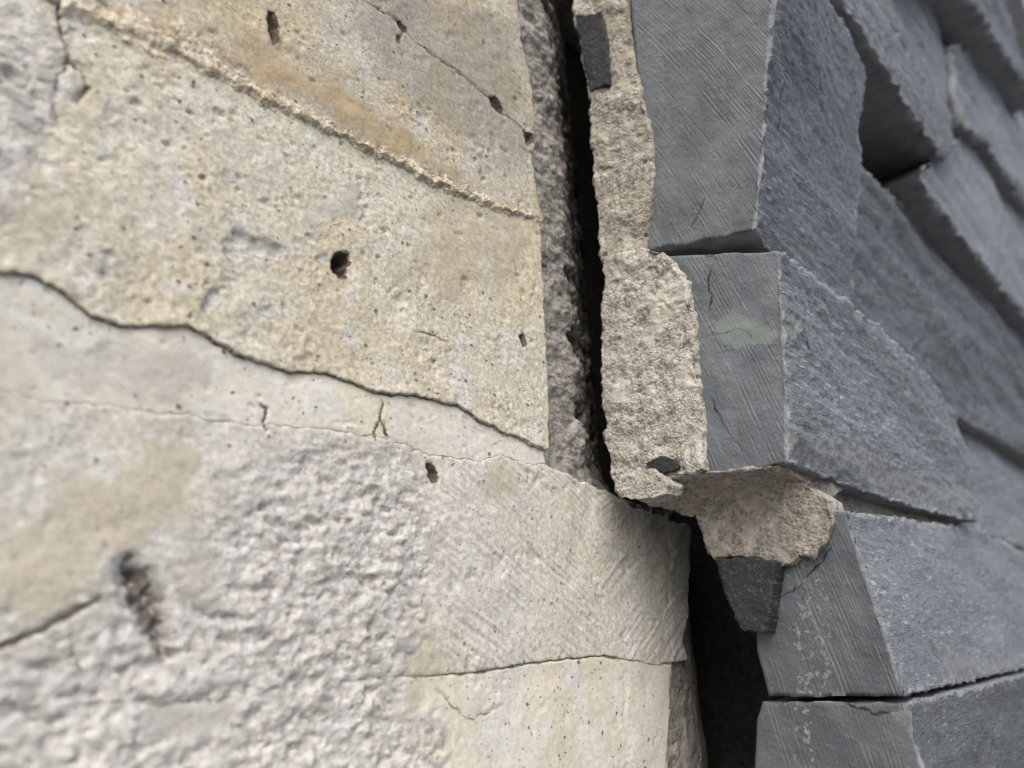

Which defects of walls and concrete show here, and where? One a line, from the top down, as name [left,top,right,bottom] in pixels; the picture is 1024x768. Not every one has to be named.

crack [52,4,91,120]
crack [361,0,534,143]
crack [0,271,544,450]
crack [0,600,97,648]
spalling [0,437,444,768]
crack [412,655,673,760]